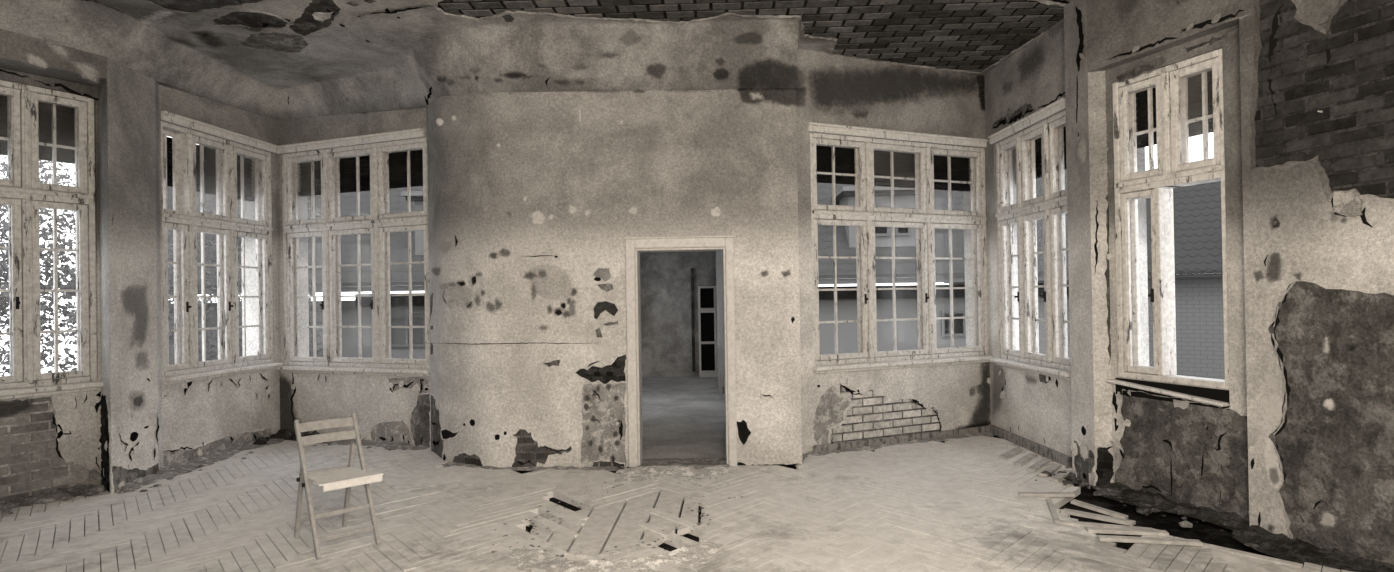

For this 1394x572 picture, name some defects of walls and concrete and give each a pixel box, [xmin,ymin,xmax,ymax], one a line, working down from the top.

peeling [140,0,377,54]
spalling [430,0,1067,74]
crack [1017,0,1244,123]
peeling [1105,56,1167,90]
spalling [1185,0,1394,227]
peeling [430,268,501,355]
spalling [592,267,620,338]
peeling [1094,169,1111,374]
spalling [0,391,272,501]
peeling [494,353,628,470]
spalling [812,381,942,445]
spalling [1070,277,1394,565]